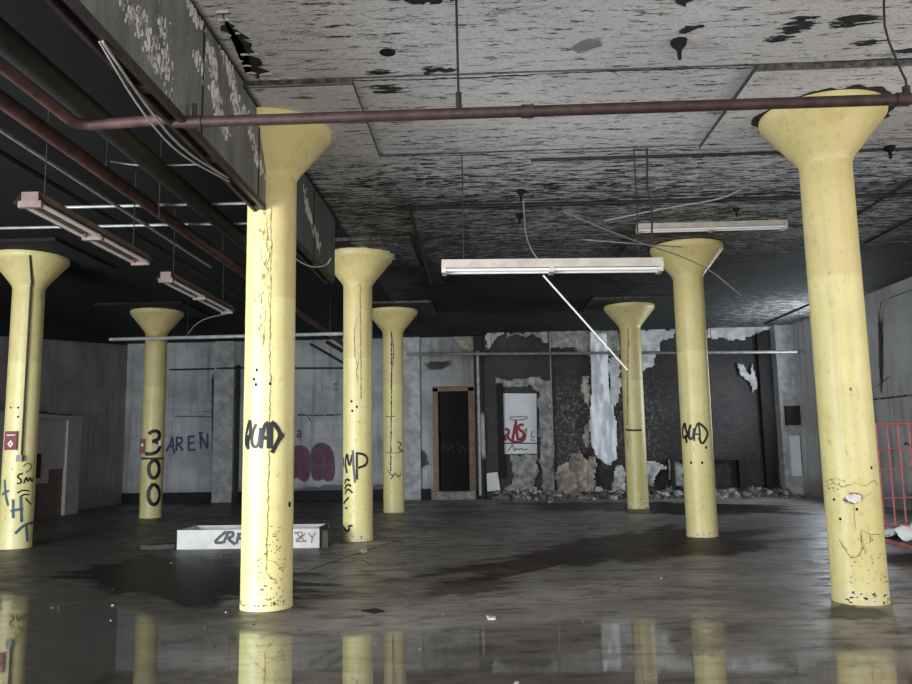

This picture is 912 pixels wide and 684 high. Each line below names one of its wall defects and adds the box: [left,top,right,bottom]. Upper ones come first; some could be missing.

spalling [763,14,883,43]
spalling [185,0,296,116]
peeling [219,126,266,180]
spalling [827,479,862,504]
crack [825,479,880,558]